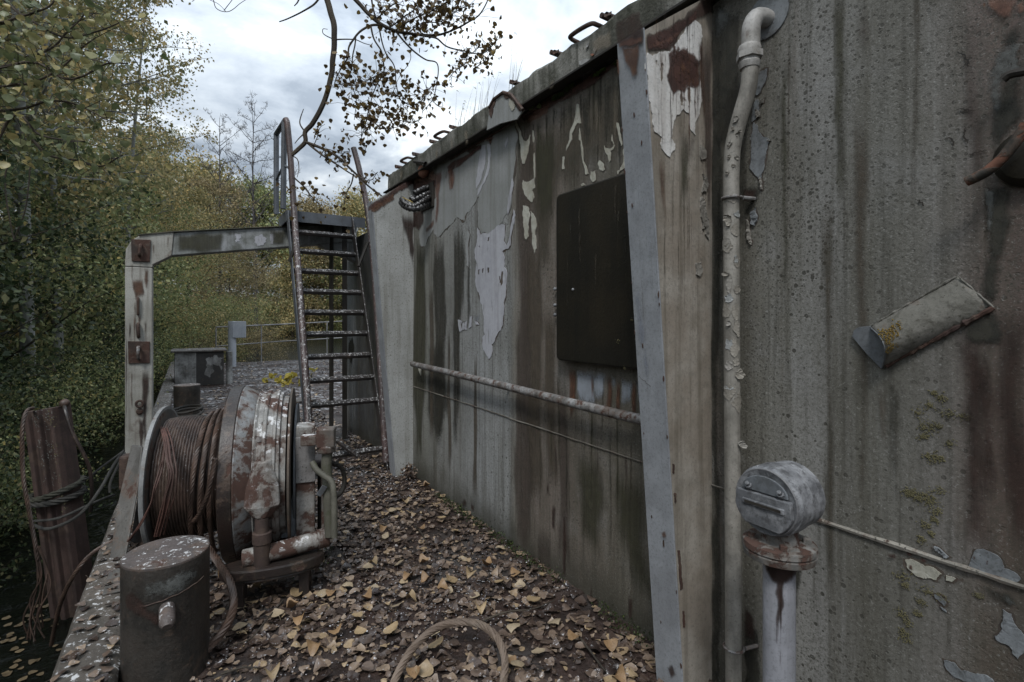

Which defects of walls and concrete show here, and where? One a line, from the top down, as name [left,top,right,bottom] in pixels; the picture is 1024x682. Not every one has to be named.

peeling [562,103,626,187]
corrosion [489,0,716,199]
peeling [645,20,707,160]
peeling [725,67,771,191]
leakage [835,13,843,136]
leakage [990,27,1023,141]
peeling [419,120,537,360]
leakage [413,237,470,455]
leakage [528,258,567,485]
leakage [582,416,651,588]
peeling [903,543,958,614]
peeling [994,608,1024,660]